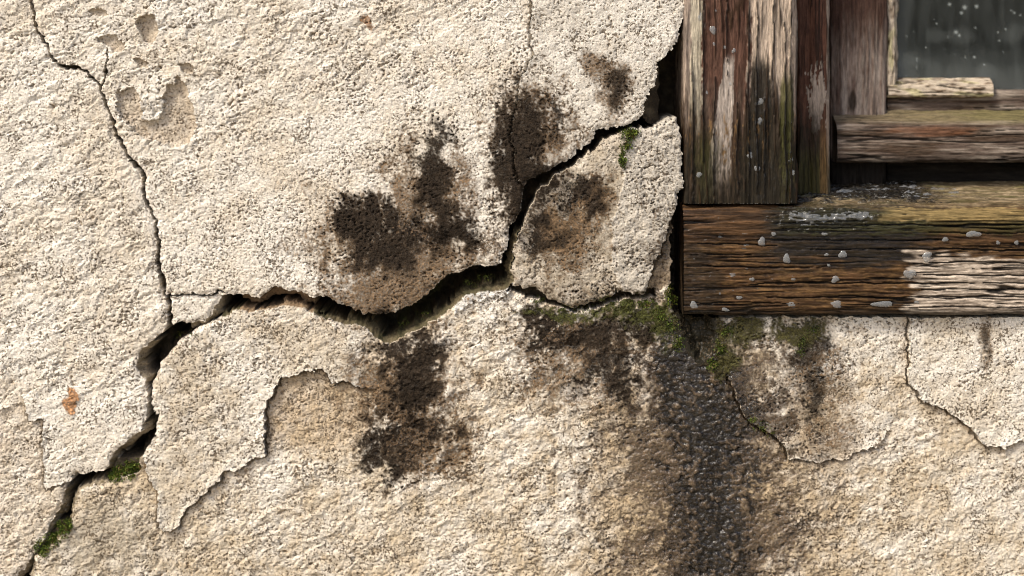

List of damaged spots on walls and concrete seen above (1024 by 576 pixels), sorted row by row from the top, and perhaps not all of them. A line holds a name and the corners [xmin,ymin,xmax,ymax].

corrosion [62,387,79,415]
crack [18,0,658,576]
water stain [287,72,863,576]
water stain [577,53,636,120]